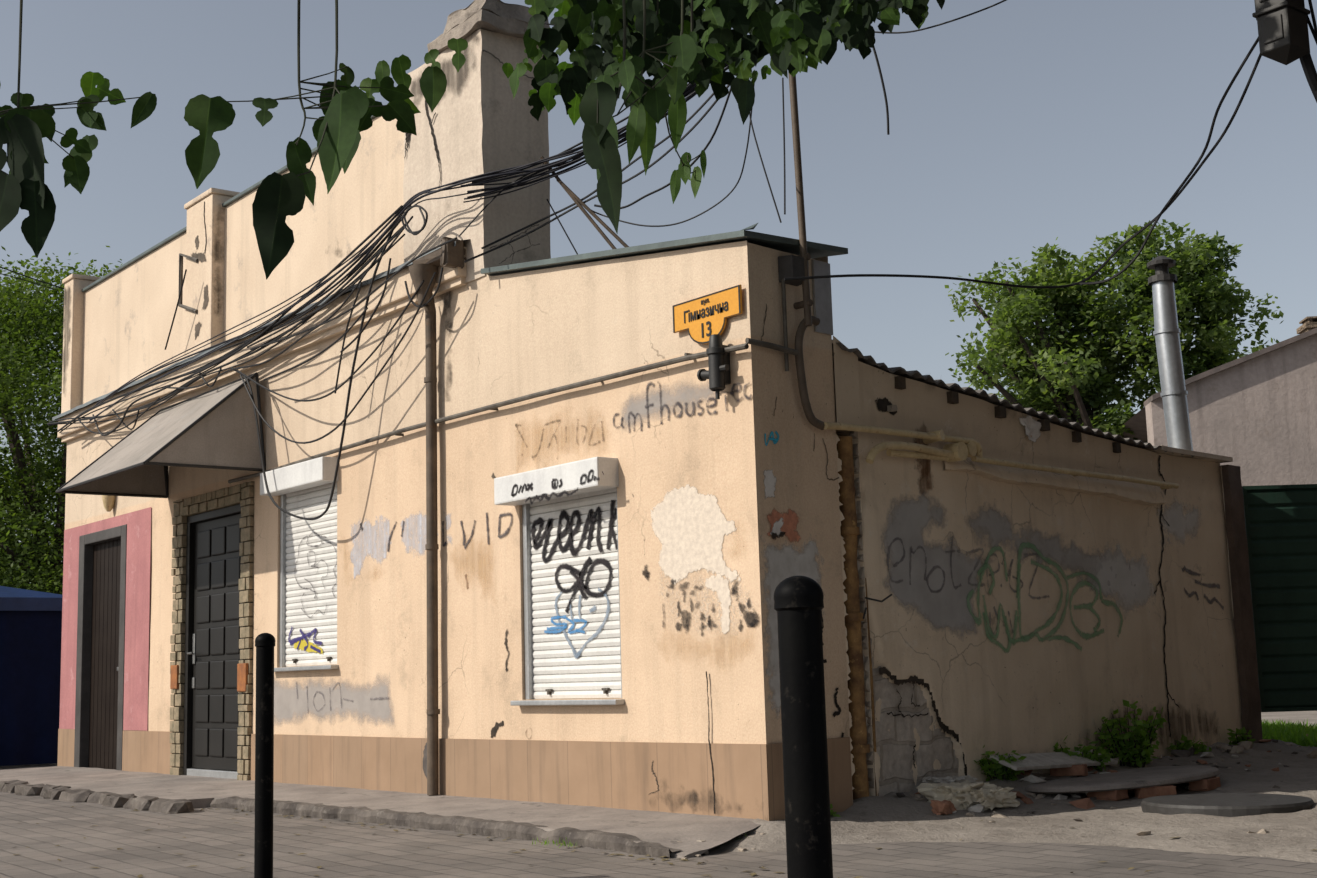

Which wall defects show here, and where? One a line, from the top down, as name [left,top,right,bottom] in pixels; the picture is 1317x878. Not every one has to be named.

crack [404,100,441,186]
peeling [651,484,741,634]
spalling [763,470,800,542]
spalling [836,431,967,796]
crack [1154,455,1179,737]